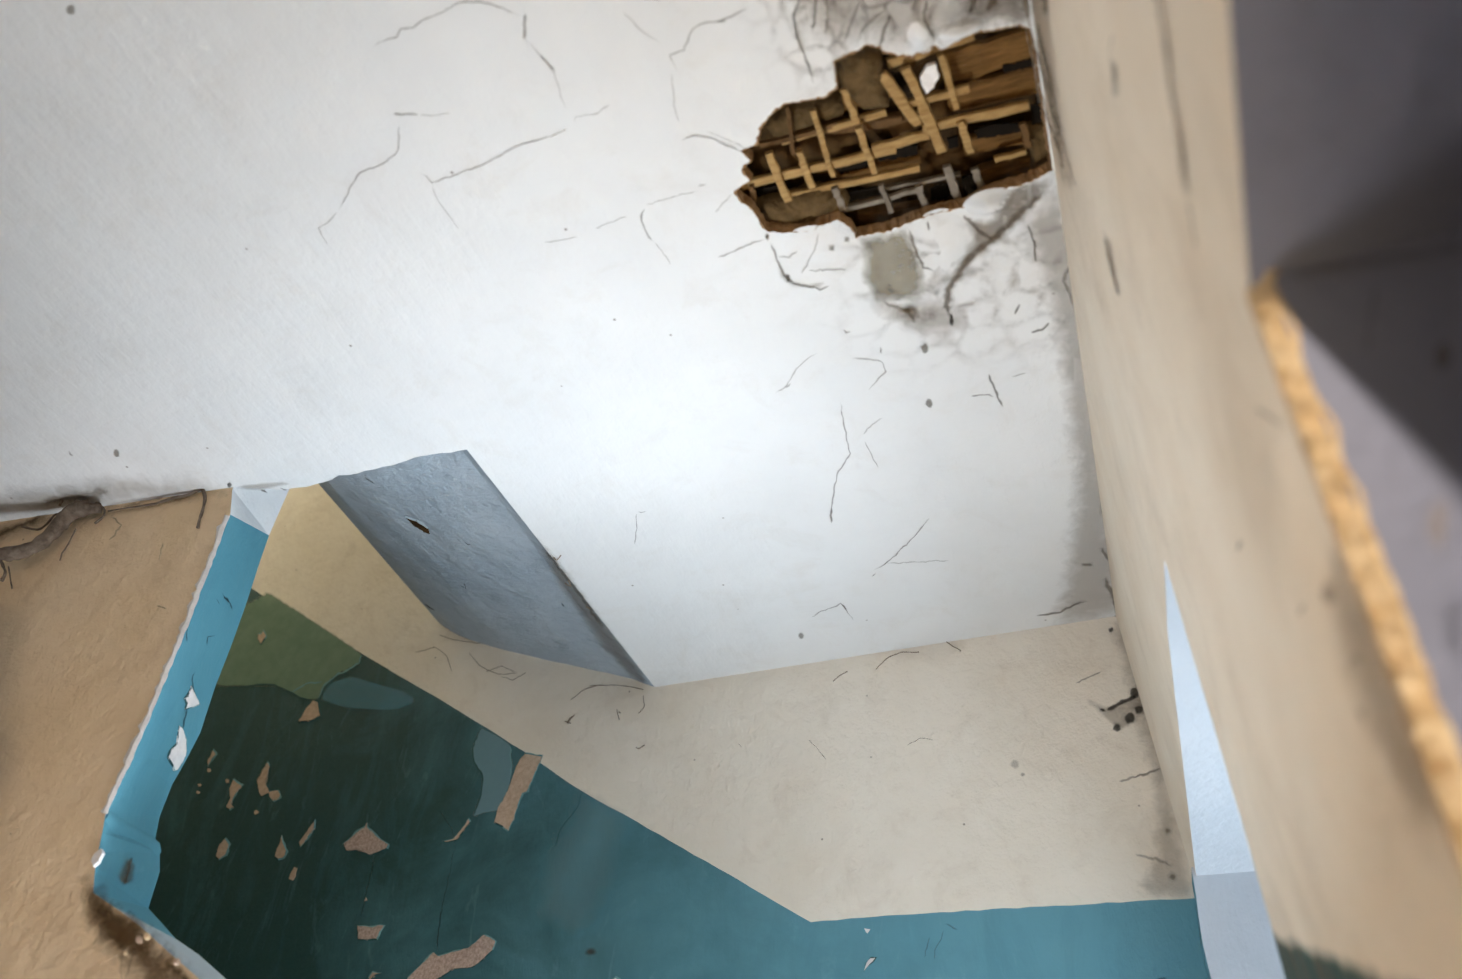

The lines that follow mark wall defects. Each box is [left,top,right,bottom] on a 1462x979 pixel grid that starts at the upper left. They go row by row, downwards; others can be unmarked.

crack [344,114,416,200]
crack [430,139,540,183]
flaking render [734,25,1052,238]
damp [867,223,929,297]
peeling [442,728,543,842]
peeling [215,838,231,860]
peeling [274,819,316,881]
peeling [343,823,390,856]
flaking render [123,933,150,956]
damp [92,892,187,979]
peeling [357,924,386,941]
peeling [407,934,497,979]